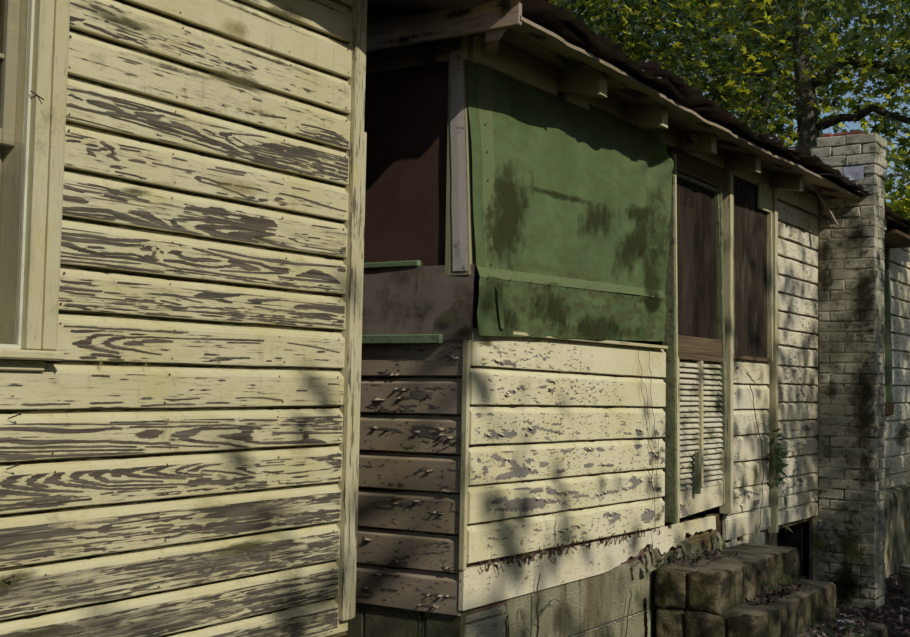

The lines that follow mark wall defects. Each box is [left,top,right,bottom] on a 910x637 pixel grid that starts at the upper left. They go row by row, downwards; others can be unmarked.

peeling [70,0,260,75]
peeling [65,133,346,212]
peeling [66,85,349,182]
peeling [60,183,347,292]
peeling [59,279,345,328]
peeling [64,325,265,362]
peeling [0,492,341,567]
peeling [0,454,342,511]
peeling [0,416,343,460]
peeling [356,385,461,611]
peeling [471,336,665,558]
peeling [0,531,340,637]